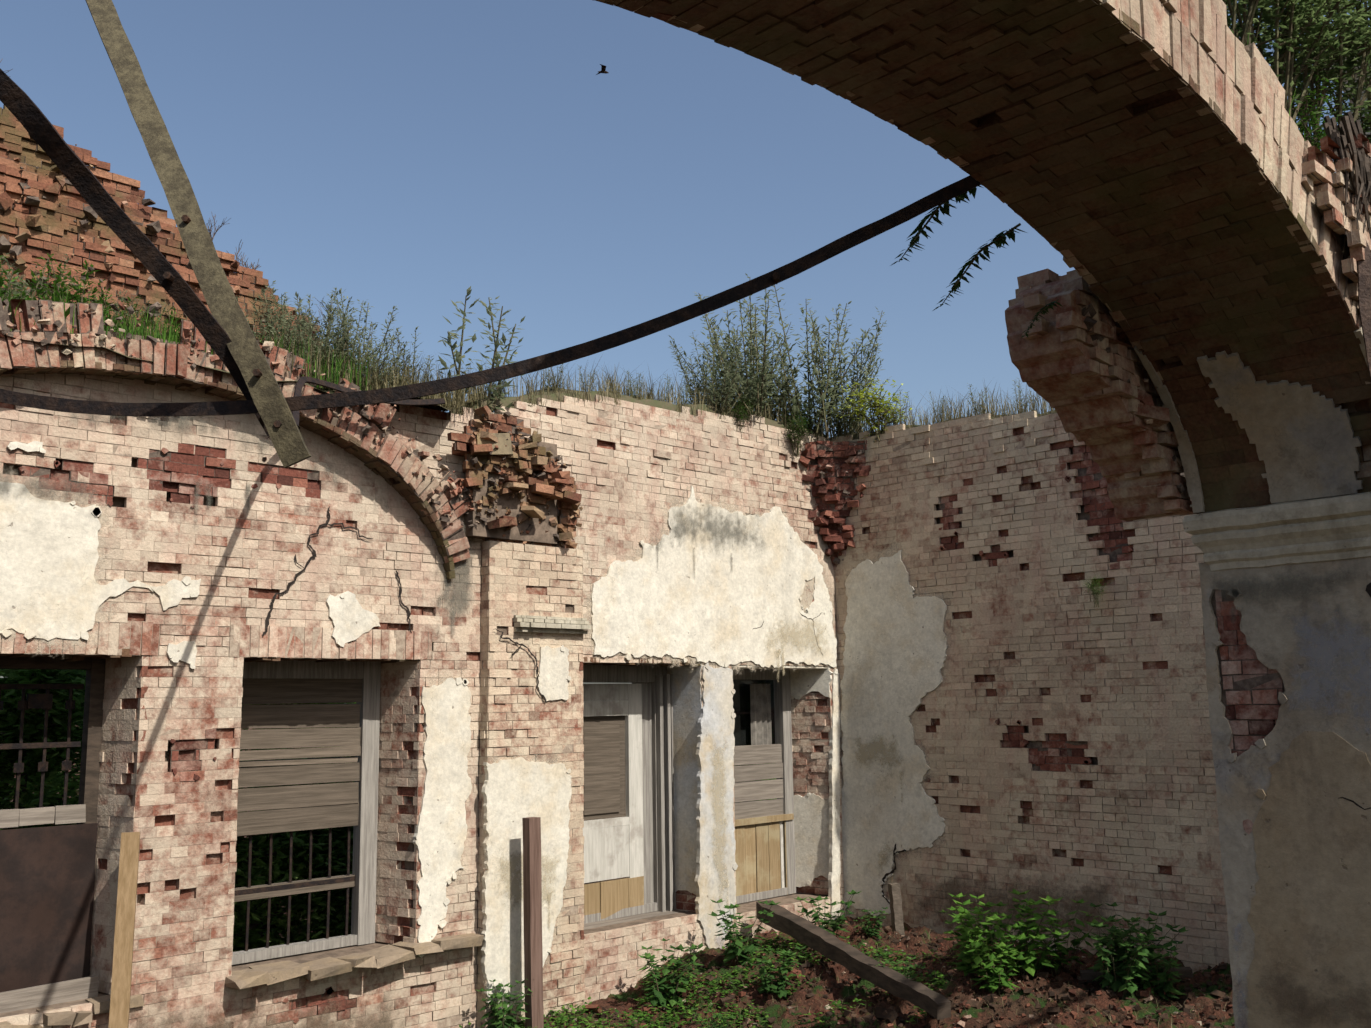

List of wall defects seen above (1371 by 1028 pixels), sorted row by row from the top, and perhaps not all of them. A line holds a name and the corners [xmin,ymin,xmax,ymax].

peeling [0,441,201,641]
crack [263,506,373,636]
spalling [1065,446,1135,570]
peeling [1134,346,1205,513]
peeling [1197,351,1363,504]
peeling [590,485,947,949]
spalling [1214,588,1288,763]
peeling [413,677,572,1009]
peeling [1243,731,1371,1028]